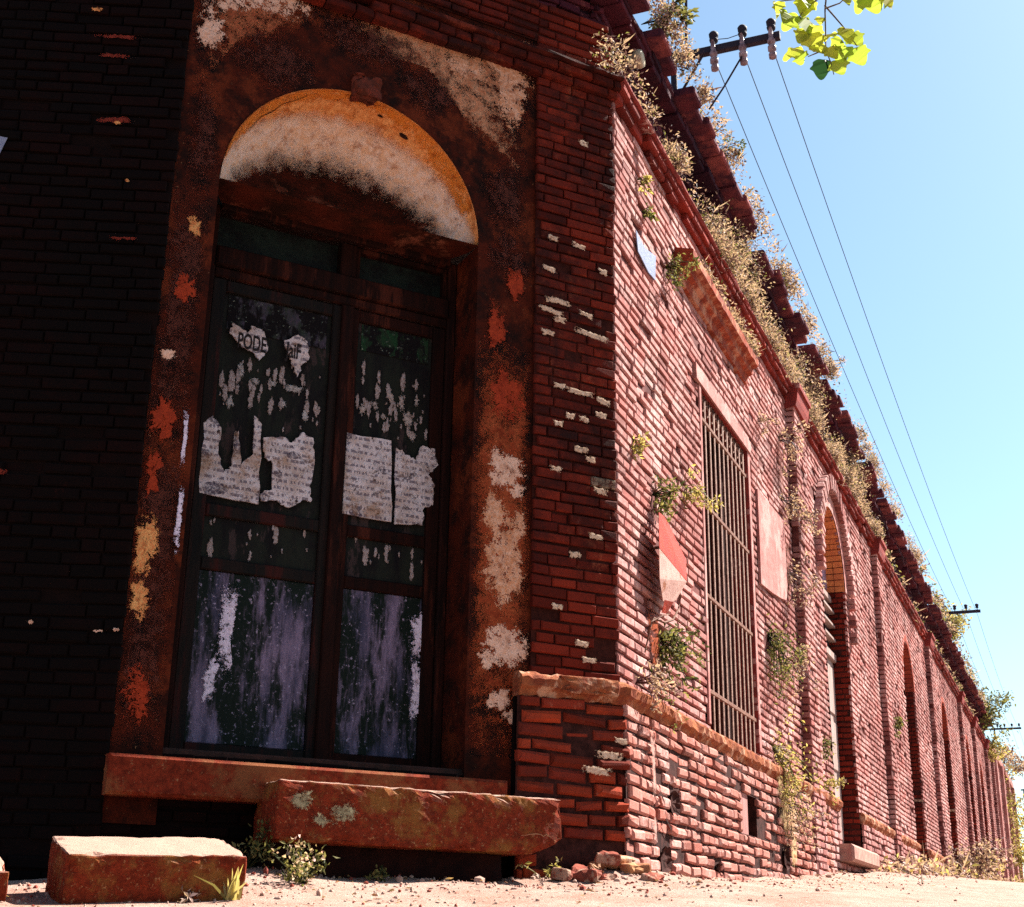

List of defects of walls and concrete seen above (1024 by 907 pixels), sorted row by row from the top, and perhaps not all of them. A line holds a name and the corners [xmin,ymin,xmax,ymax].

leakage [326,19,459,108]
flaking render [187,216,201,236]
flaking render [174,273,196,304]
flaking render [506,267,524,302]
flaking render [148,395,189,465]
flaking render [145,451,163,498]
peeling [173,488,185,552]
flaking render [470,299,529,757]
flaking render [129,512,161,623]
flaking render [121,663,151,726]